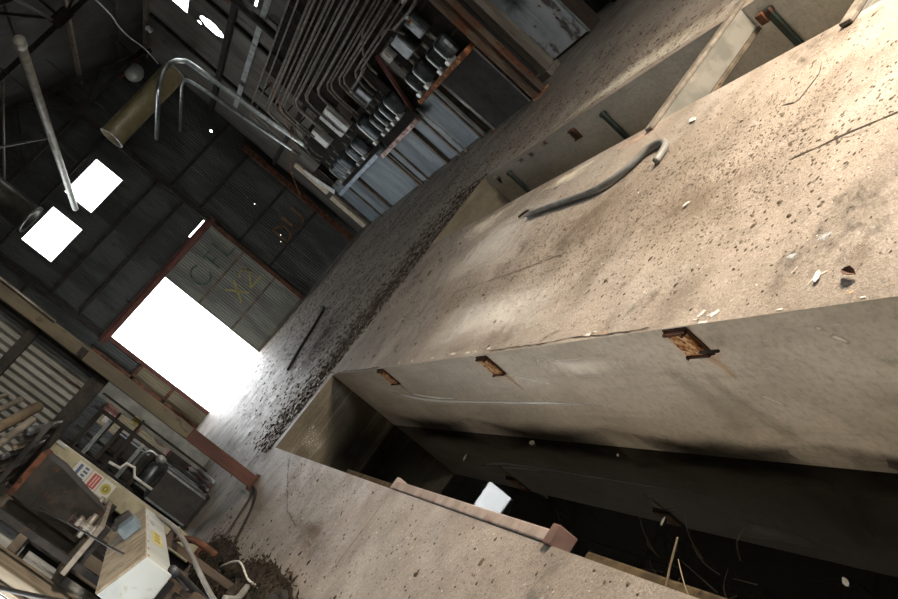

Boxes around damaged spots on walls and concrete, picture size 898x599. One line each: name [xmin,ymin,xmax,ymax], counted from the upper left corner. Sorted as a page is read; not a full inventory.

crack [789,111,898,160]